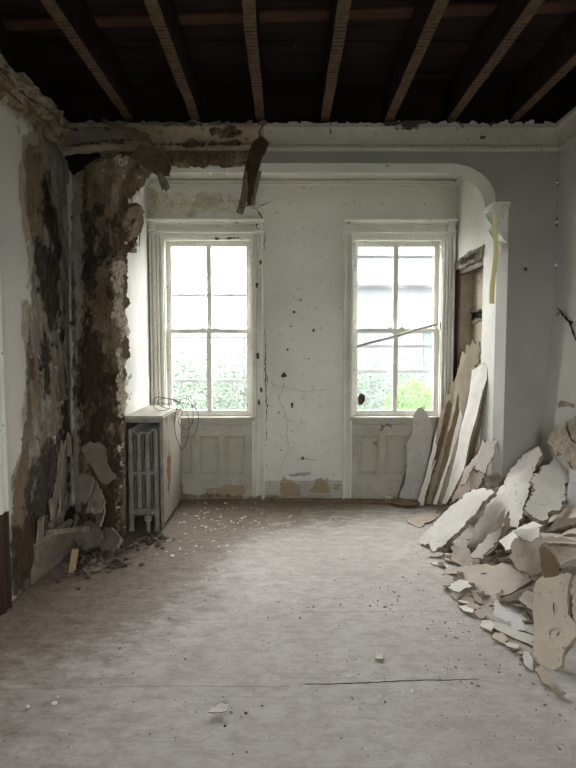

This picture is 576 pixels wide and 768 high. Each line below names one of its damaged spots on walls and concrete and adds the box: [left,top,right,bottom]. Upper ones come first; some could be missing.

flaking render [139,119,555,139]
damp [11,129,130,597]
flaking render [0,53,154,577]
crack [264,325,324,468]
peeling [268,473,337,497]